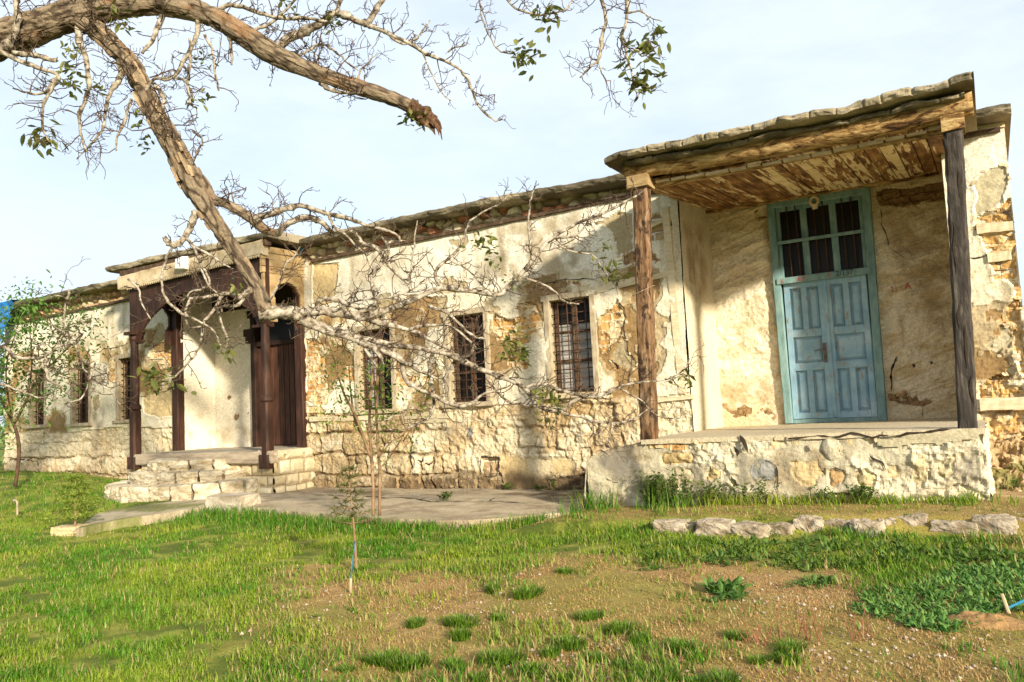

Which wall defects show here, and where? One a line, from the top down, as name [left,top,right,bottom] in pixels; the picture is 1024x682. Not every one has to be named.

flaking render [876,182,945,208]
flaking render [311,263,340,306]
flaking render [971,163,1024,441]
flaking render [490,301,543,344]
flaking render [597,300,638,371]
flaking render [507,357,530,370]
crack [890,357,898,391]
flaking render [722,404,777,420]
flaking render [888,390,933,406]